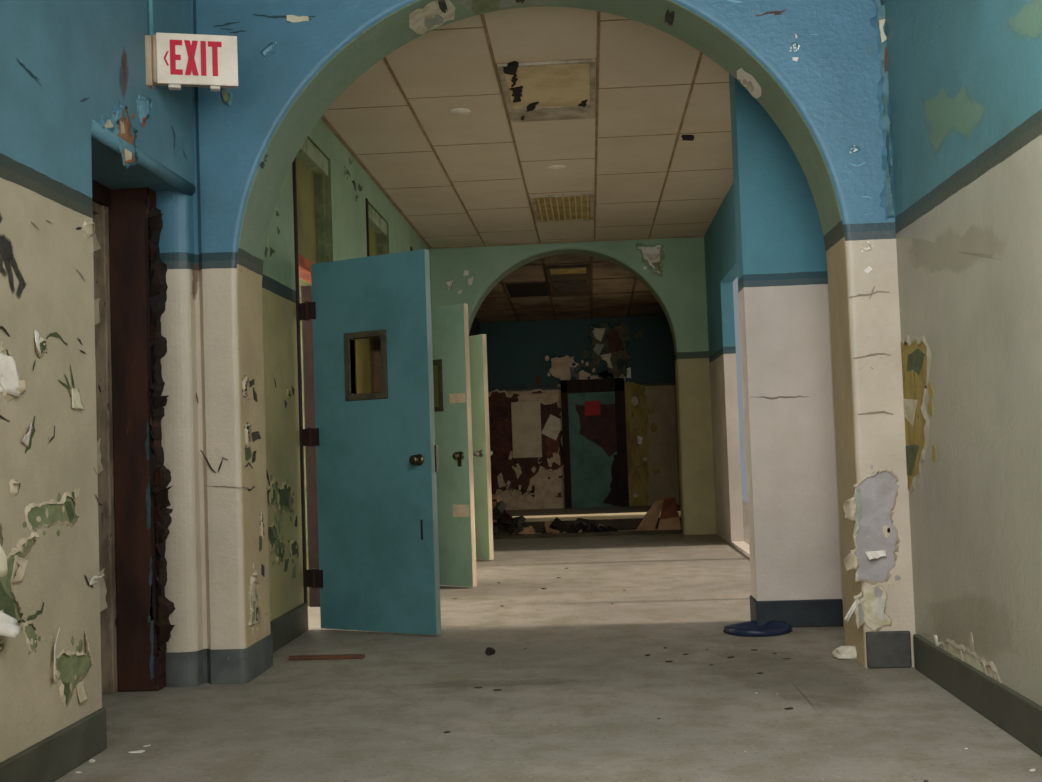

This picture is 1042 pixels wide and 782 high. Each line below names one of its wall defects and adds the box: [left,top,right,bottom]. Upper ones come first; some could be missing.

flaking render [100,95,152,168]
crack [849,286,890,299]
peeling [0,341,26,402]
peeling [488,317,660,510]
crack [758,394,809,402]
crack [853,353,891,369]
crack [858,409,893,417]
flaking render [843,332,936,632]
peeling [0,488,80,655]
peeling [152,465,175,657]
peeling [248,475,299,634]
peeling [51,627,92,708]